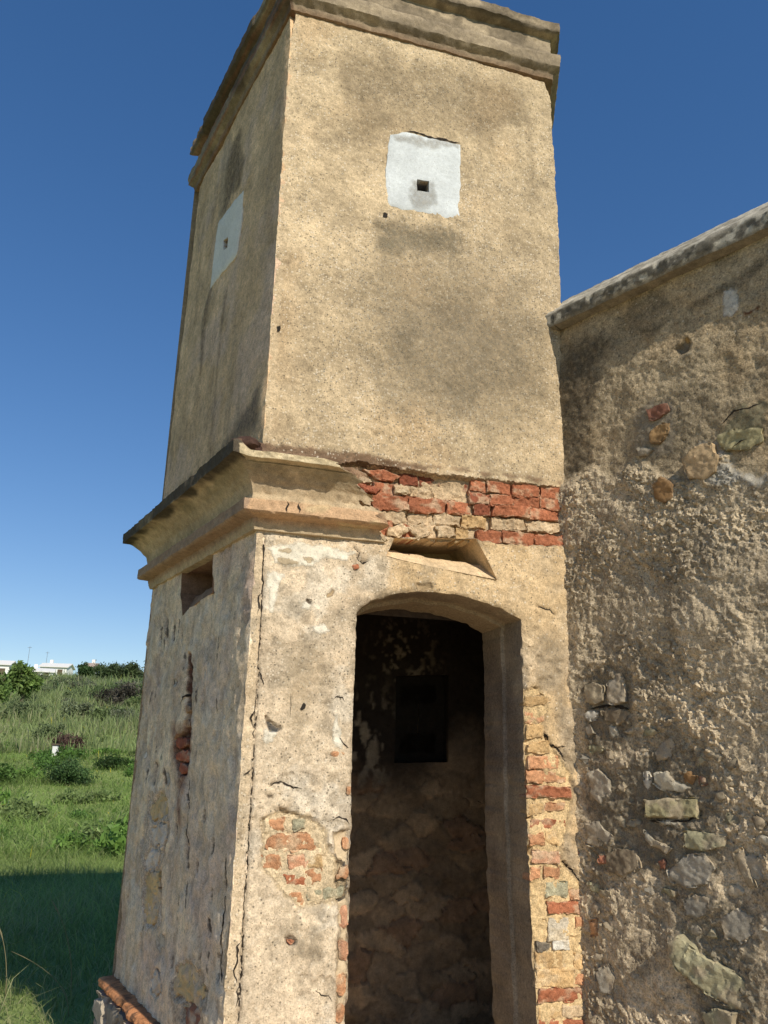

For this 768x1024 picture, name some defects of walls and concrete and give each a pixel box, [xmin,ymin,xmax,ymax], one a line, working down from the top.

crack [723,402,762,448]
crack [220,540,299,1021]
spalling [261,812,350,1023]